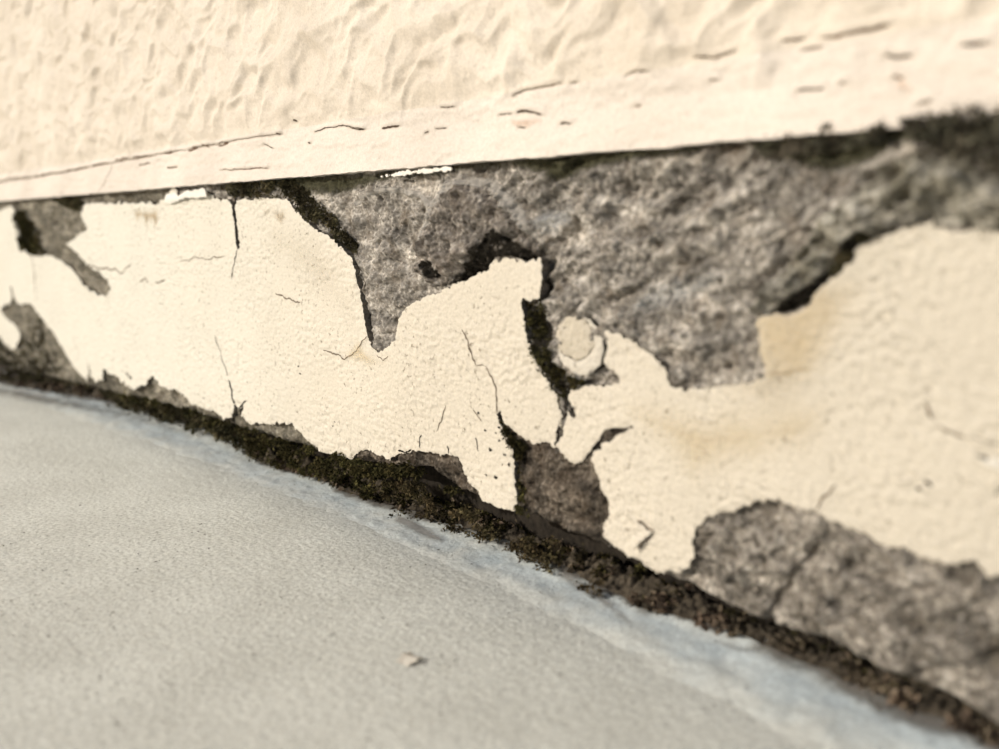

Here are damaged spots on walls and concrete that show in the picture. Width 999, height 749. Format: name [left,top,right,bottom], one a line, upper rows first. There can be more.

crack [0,119,399,190]
crack [90,264,164,284]
crack [182,236,240,277]
crack [215,337,246,414]
crack [462,330,497,450]
peeling [0,140,999,562]
crack [398,406,449,453]
peeling [667,500,999,724]